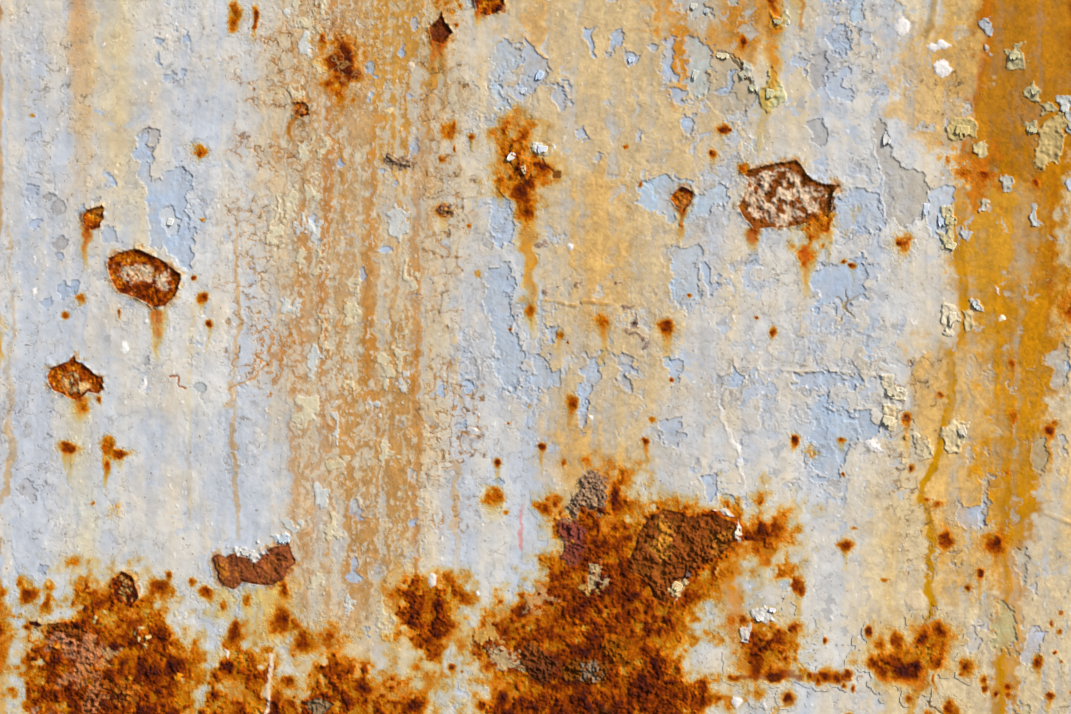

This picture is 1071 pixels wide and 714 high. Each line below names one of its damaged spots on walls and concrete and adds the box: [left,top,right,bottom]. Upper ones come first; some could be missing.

spalling [465,0,512,26]
peeling [484,35,575,113]
peeling [581,0,775,140]
peeling [789,0,870,149]
peeling [1023,87,1071,136]
spalling [634,113,974,316]
peeling [998,174,1016,193]
peeling [940,298,985,337]
rust [0,0,828,714]
rust [709,0,1071,714]
peeling [1044,342,1071,391]
peeling [954,471,998,532]